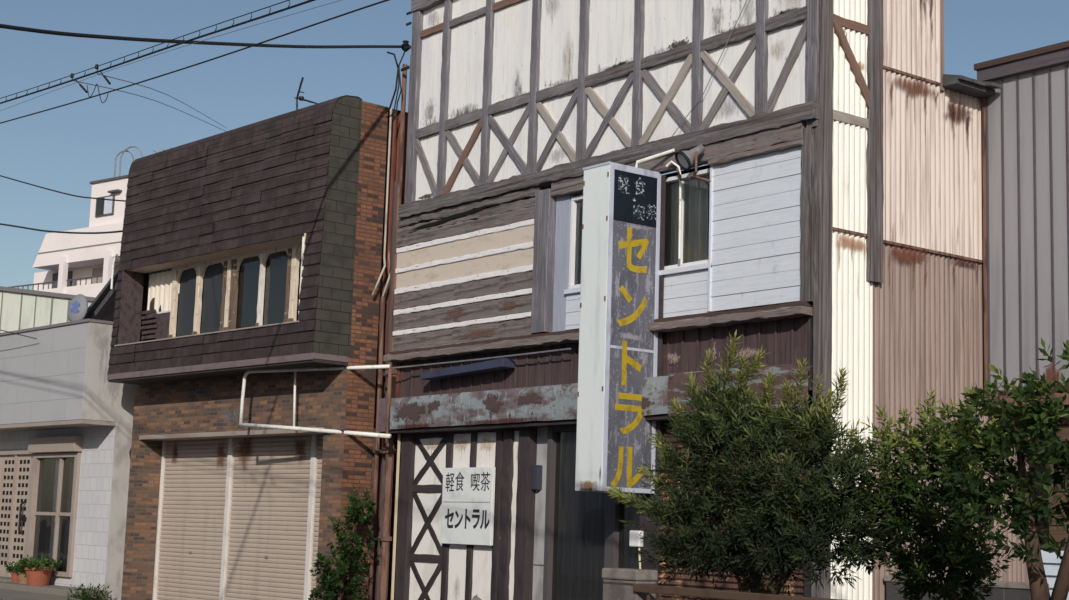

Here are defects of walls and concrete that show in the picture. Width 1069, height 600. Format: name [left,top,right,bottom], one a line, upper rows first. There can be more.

corrosion [890,77,971,142]
corrosion [838,235,865,262]
peeling [392,400,440,421]
peeling [483,391,542,418]
corrosion [238,440,250,463]